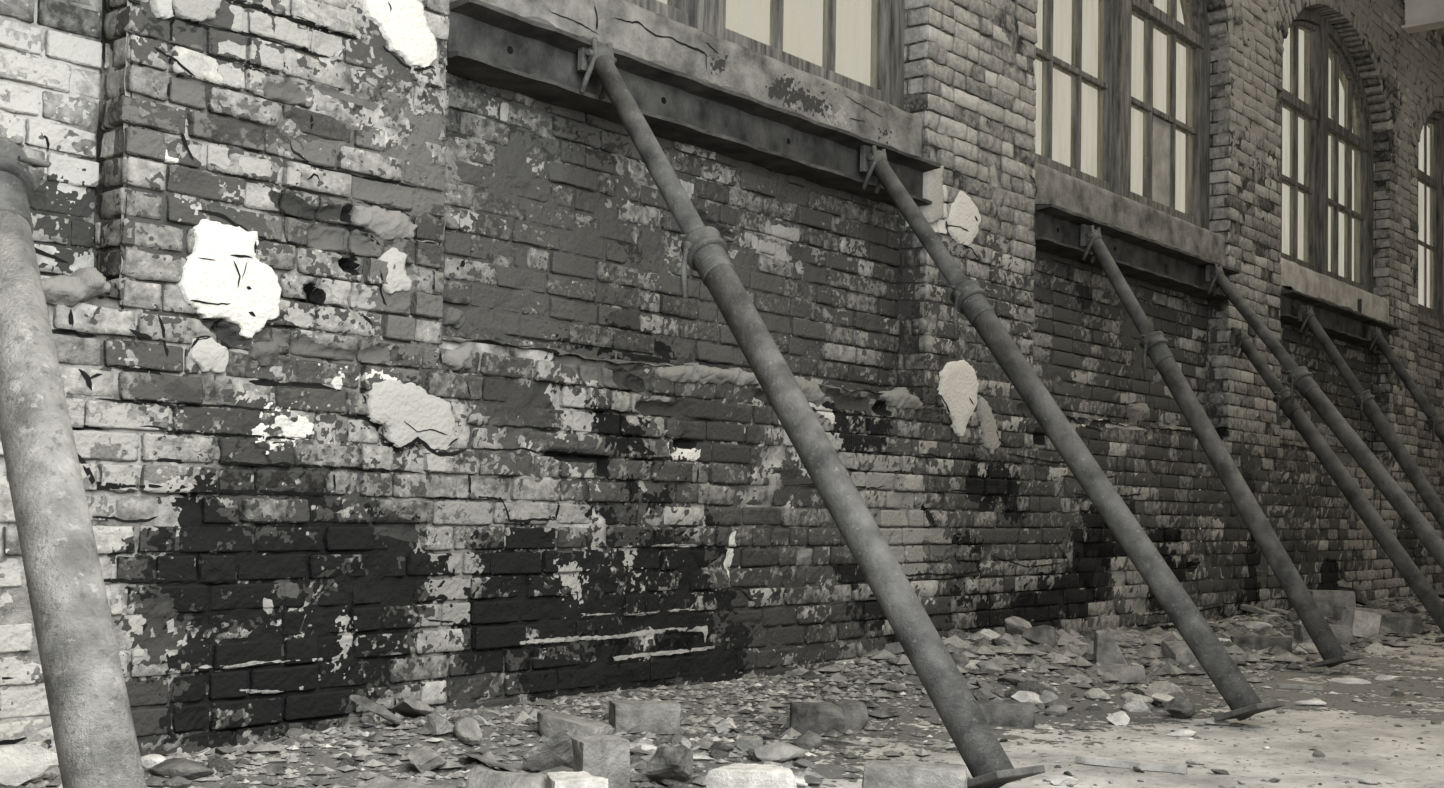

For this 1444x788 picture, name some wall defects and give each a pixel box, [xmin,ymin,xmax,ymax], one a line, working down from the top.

crack [549,7,718,69]
spalling [192,313,248,347]
water stain [281,270,383,337]
water stain [546,283,753,373]
water stain [1120,392,1136,403]
water stain [1235,442,1258,497]
water stain [64,350,959,788]
water stain [908,414,1231,747]
water stain [1208,497,1294,636]
water stain [1285,532,1321,590]
water stain [1394,521,1425,570]
water stain [1230,645,1444,720]